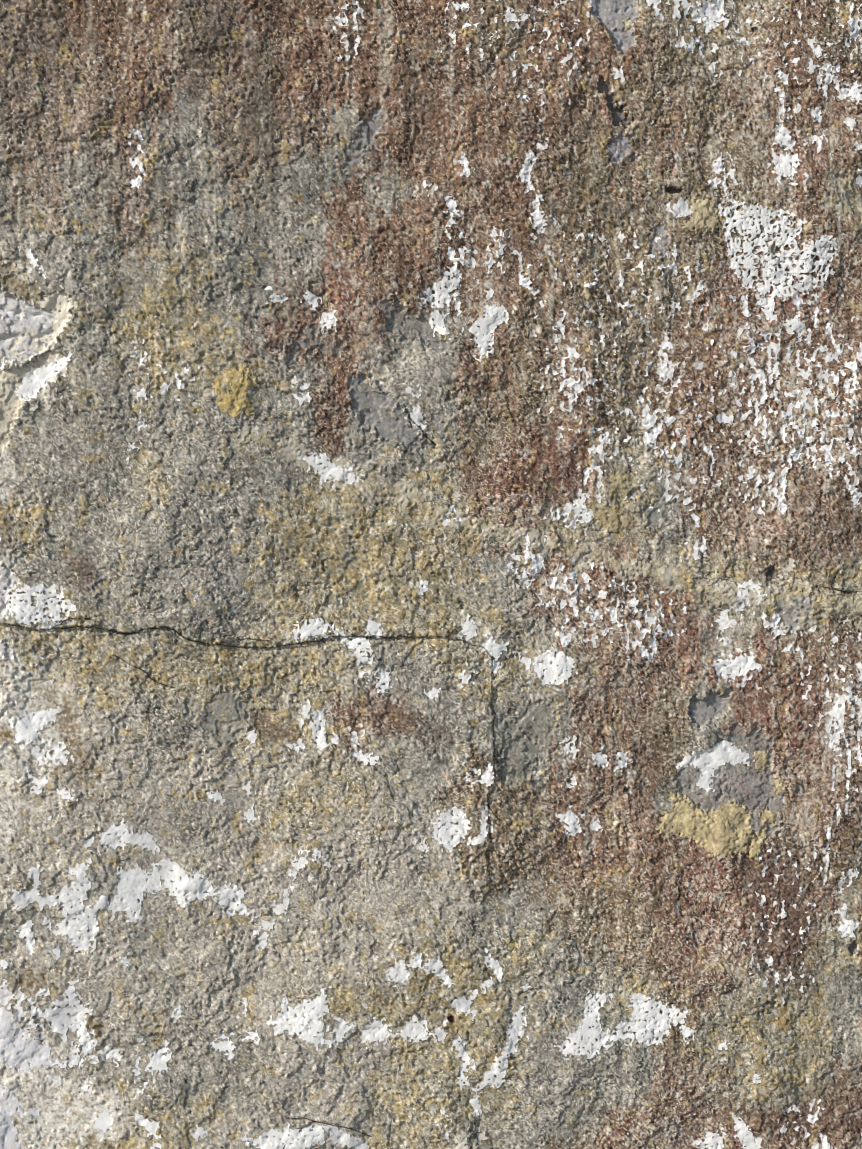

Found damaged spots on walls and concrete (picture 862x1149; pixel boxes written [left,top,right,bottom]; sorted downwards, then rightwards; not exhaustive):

peeling [127,128,146,189]
flaking render [0,246,80,450]
peeling [370,0,862,560]
peeling [0,818,337,1149]
crack [2,618,503,894]
peeling [412,802,494,860]
flaking render [457,534,687,791]
peeling [555,804,603,839]
peeling [554,990,694,1060]
flaking render [673,558,862,1004]
rust [745,855,811,988]
rust [748,1105,862,1132]